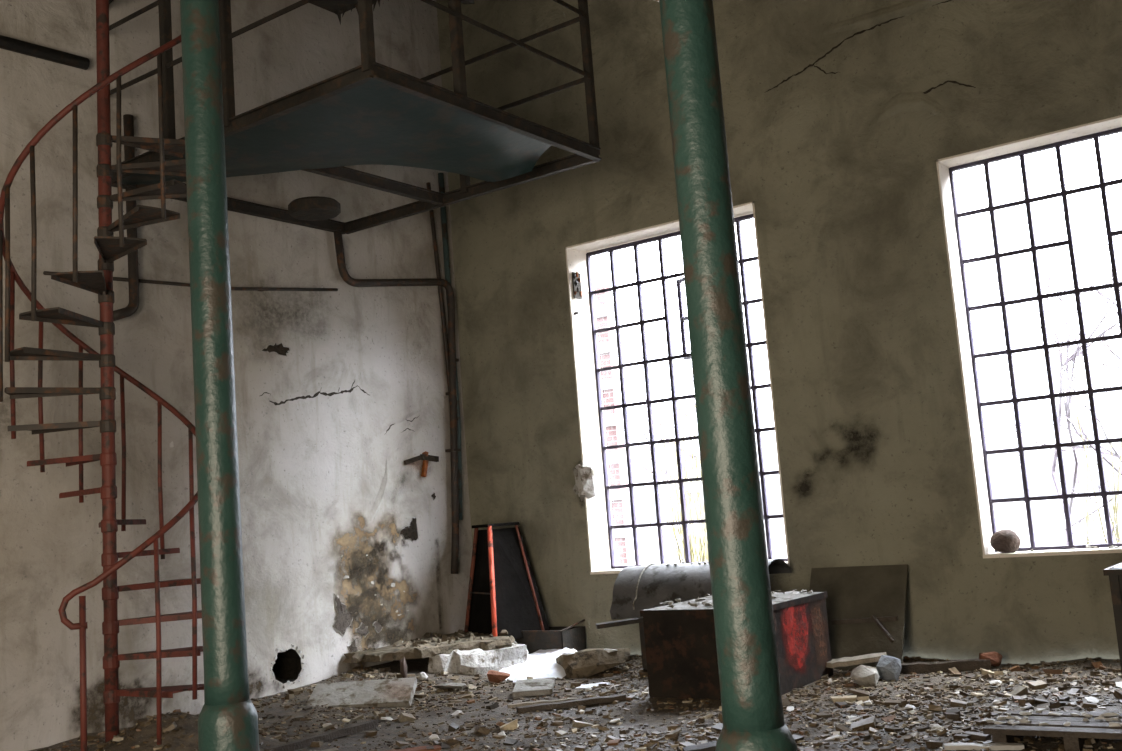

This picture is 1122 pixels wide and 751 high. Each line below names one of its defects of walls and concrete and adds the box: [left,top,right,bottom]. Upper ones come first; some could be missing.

spalling [261,342,291,357]
crack [260,381,369,405]
spalling [399,517,419,543]
spalling [270,644,306,689]